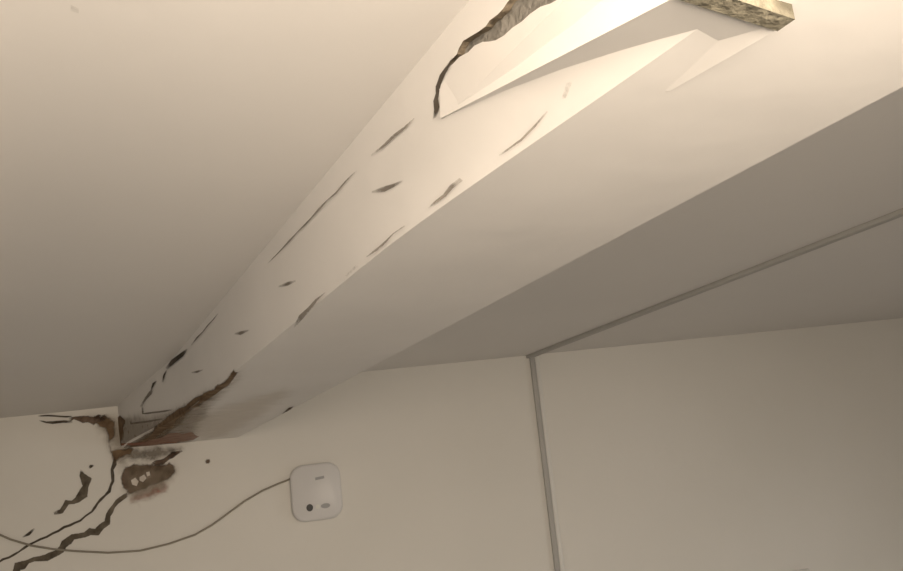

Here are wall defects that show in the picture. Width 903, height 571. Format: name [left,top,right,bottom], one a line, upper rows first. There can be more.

peeling [439,0,795,118]
crack [433,61,451,116]
crack [376,122,410,152]
crack [504,118,542,153]
crack [431,183,456,206]
crack [271,177,350,260]
crack [369,228,401,255]
crack [297,295,322,323]
crack [0,317,215,571]
rust [129,470,171,495]